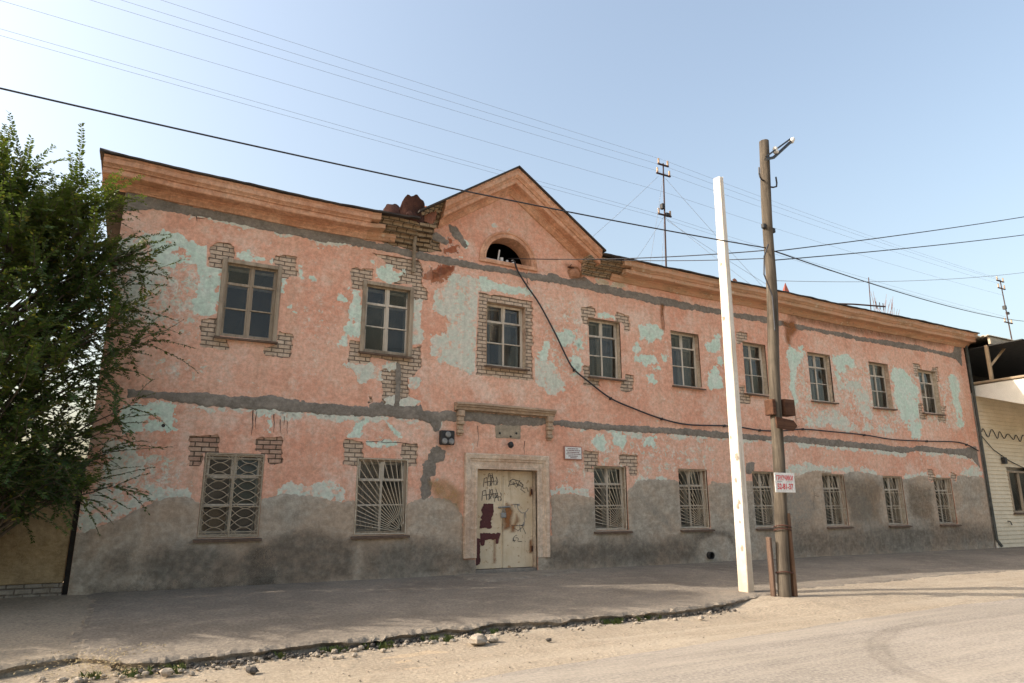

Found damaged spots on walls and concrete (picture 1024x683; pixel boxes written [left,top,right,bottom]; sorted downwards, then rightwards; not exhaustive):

peeling [189,214,255,231]
peeling [76,228,669,534]
peeling [580,354,982,483]
peeling [786,344,805,405]